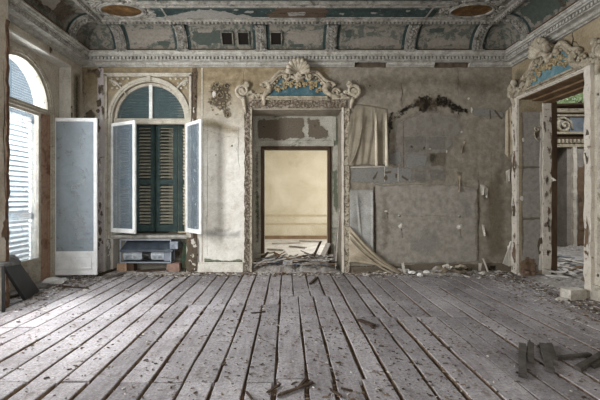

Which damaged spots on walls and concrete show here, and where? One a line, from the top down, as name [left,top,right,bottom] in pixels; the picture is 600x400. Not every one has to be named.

peeling [126,28,173,48]
peeling [287,30,322,47]
peeling [95,67,104,148]
peeling [258,117,328,140]
damp [388,94,468,149]
flaking render [577,149,589,256]
peeling [186,209,198,272]